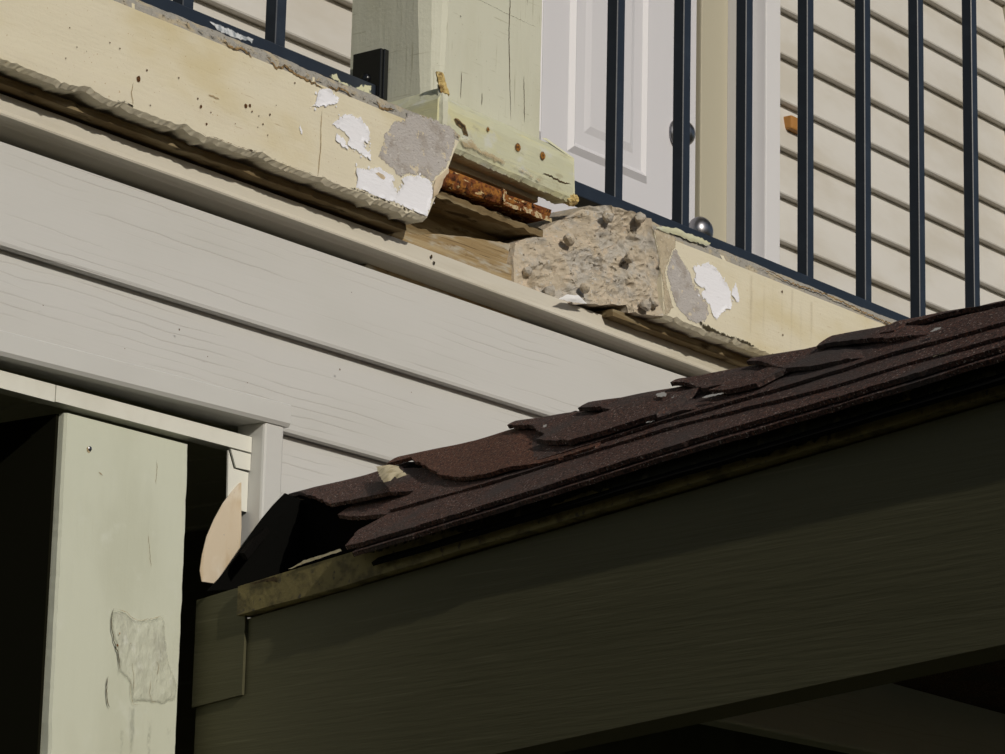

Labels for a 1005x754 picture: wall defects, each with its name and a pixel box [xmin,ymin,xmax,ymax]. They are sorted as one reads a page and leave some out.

peeling [378,112,504,198]
rust [503,189,552,223]
spalling [502,205,710,323]